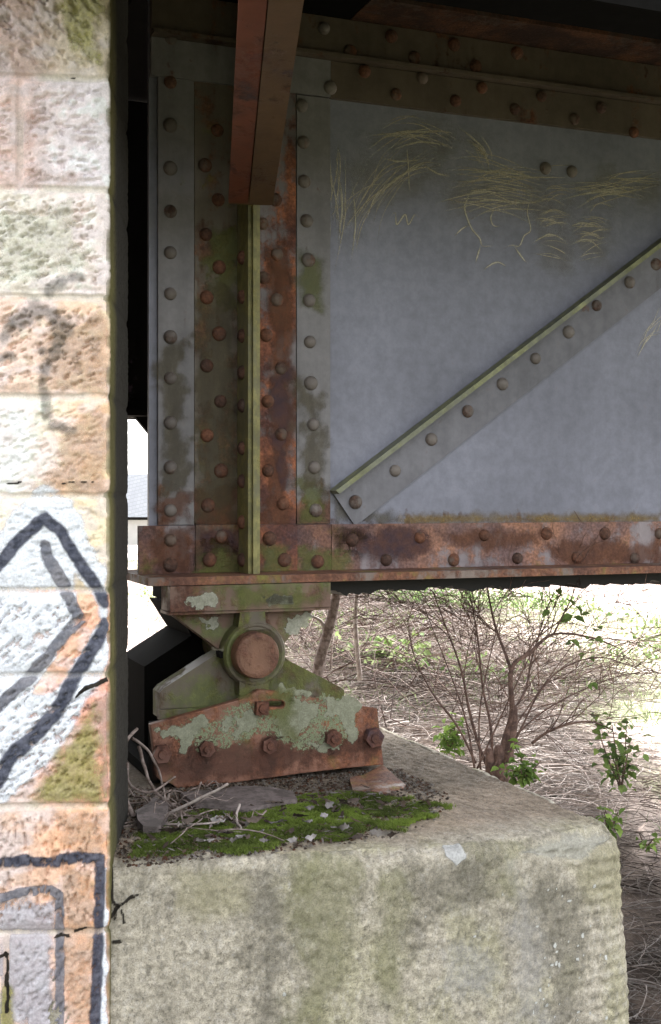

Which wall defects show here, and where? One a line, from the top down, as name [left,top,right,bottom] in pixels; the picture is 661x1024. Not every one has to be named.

rust [262,239,297,524]
rust [157,487,239,554]
rust [332,526,430,559]
rust [450,530,533,550]
rust [550,539,661,565]
peeling [184,592,219,630]
peeling [263,594,314,635]
peeling [154,709,259,754]
peeling [273,682,362,753]
rust [159,738,377,780]